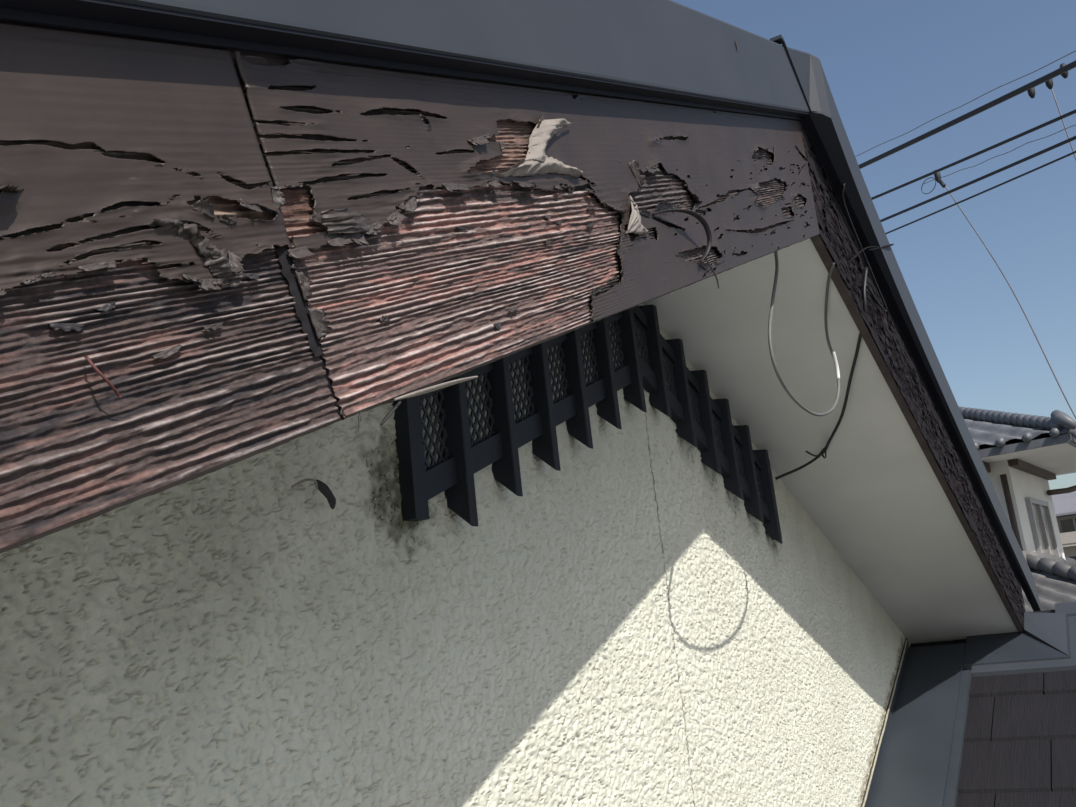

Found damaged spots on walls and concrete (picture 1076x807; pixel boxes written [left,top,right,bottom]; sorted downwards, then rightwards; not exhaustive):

damp [371,438,415,542]
peeling [0,113,1024,631]